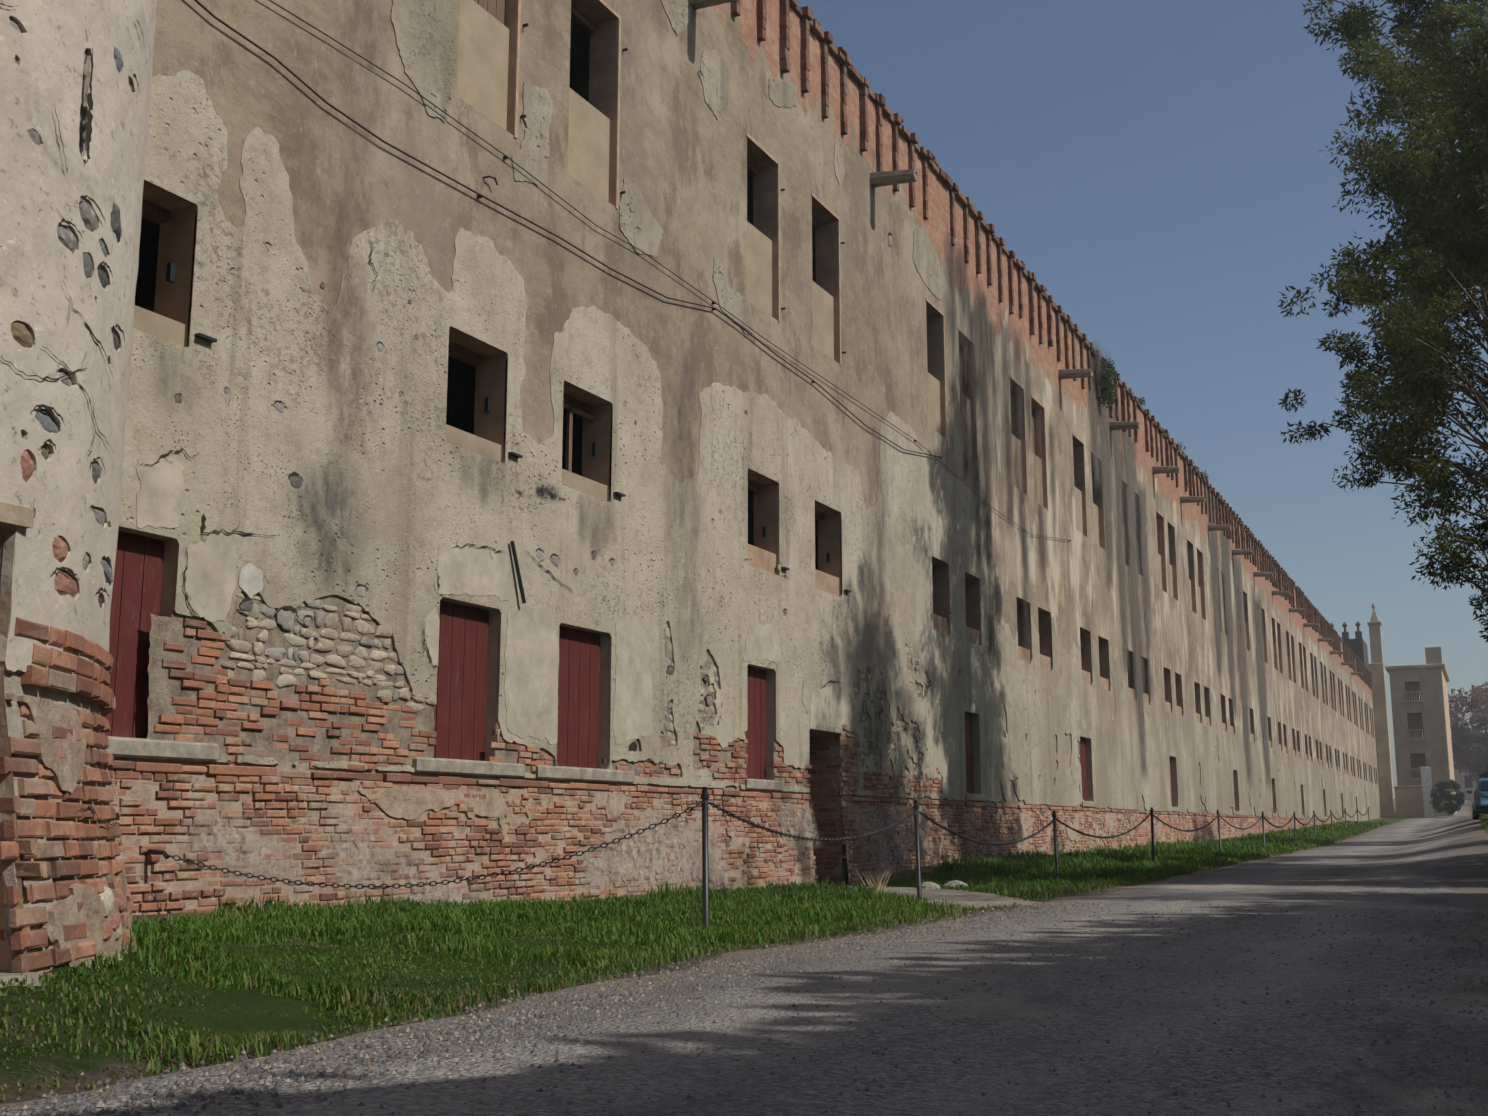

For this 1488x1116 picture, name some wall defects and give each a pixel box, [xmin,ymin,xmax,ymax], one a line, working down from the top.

spalling [57,195,121,289]
spalling [57,368,72,387]
crack [0,281,200,466]
flaking render [90,47,1381,821]
spalling [52,536,113,608]
crack [184,513,277,618]
water stain [301,474,347,571]